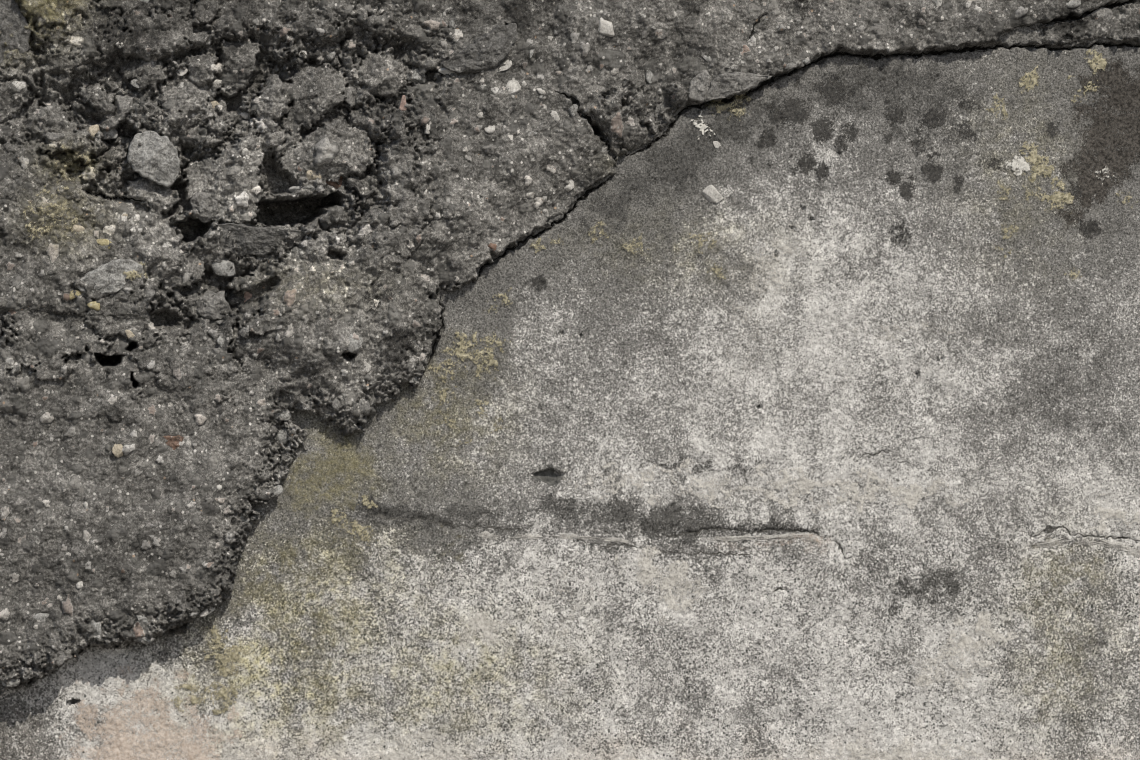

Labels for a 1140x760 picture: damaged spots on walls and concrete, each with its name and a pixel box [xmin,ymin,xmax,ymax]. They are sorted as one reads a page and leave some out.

spalling [996,0,1140,46]
spalling [0,0,450,336]
spalling [582,79,689,154]
leakage [580,51,981,233]
crack [472,1,1140,281]
leakage [1052,59,1140,239]
leakage [887,222,911,244]
spalling [226,383,313,578]
peeling [530,464,565,486]
crack [355,513,527,532]
crack [568,528,845,559]
crack [1025,525,1140,541]